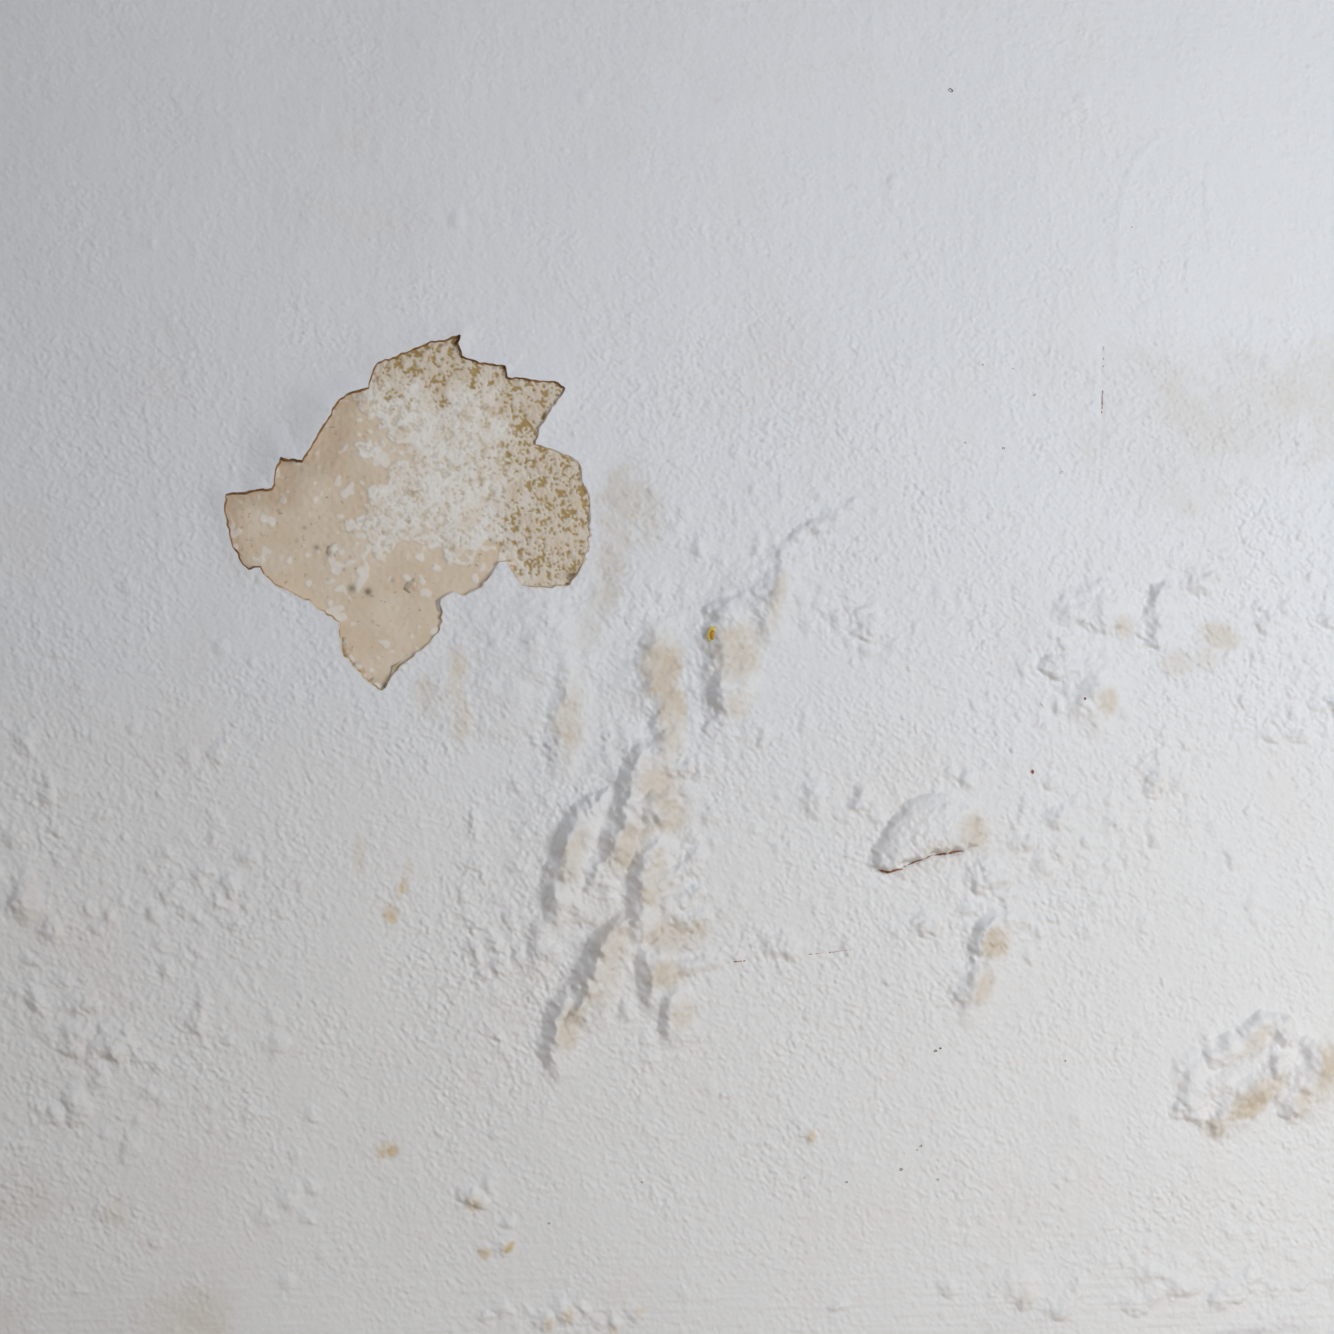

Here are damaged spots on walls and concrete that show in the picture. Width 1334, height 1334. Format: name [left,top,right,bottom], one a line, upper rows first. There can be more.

peeling [199,319,592,690]